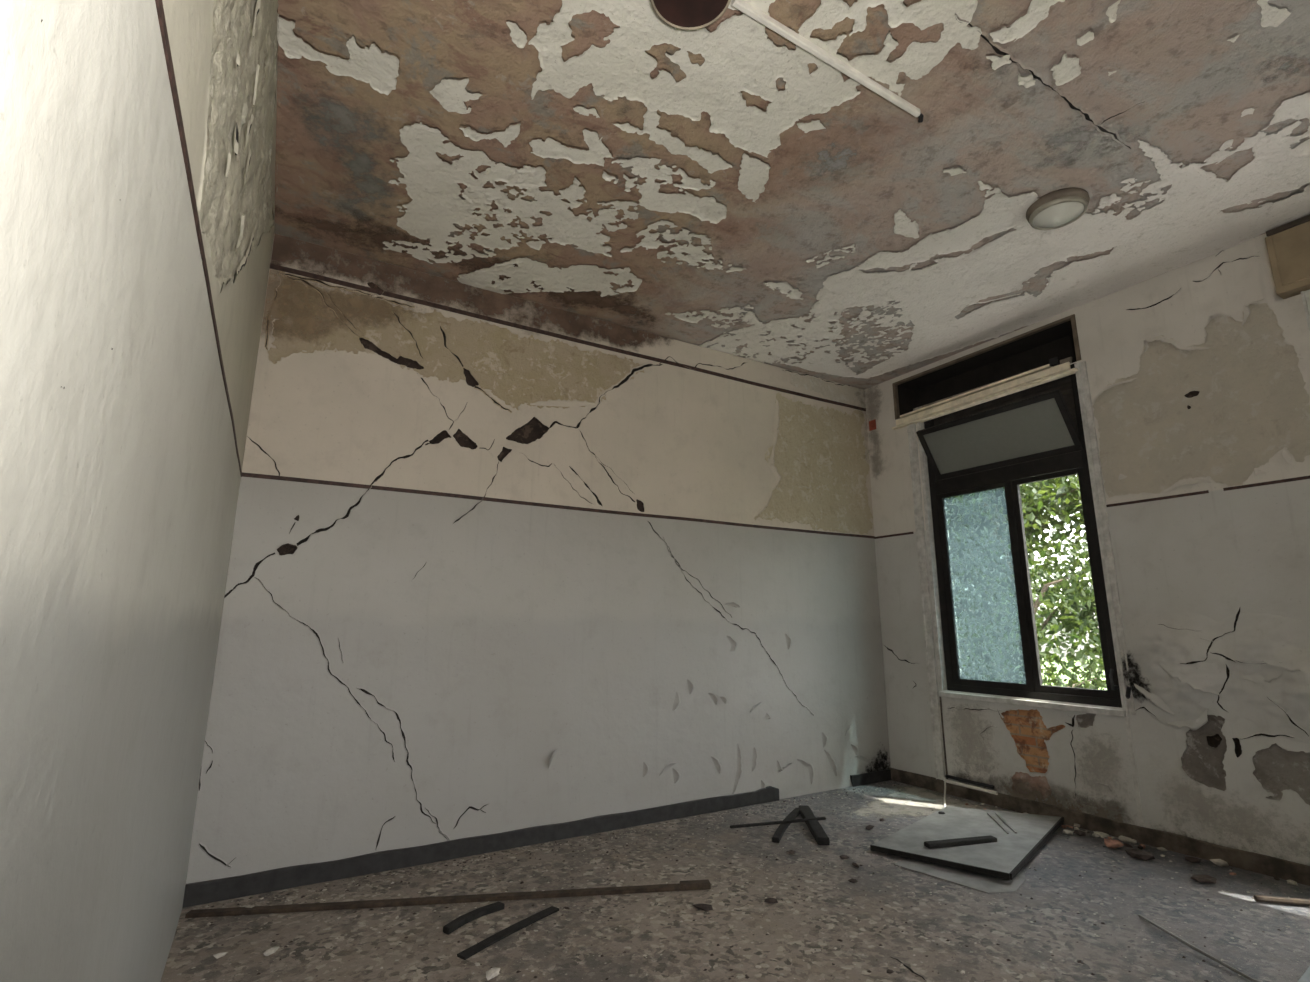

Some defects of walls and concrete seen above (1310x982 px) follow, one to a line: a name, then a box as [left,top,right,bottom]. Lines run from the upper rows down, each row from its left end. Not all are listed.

crack [226,0,261,278]
crack [955,13,1145,150]
water stain [262,96,671,348]
peeling [200,0,1310,535]
crack [224,272,814,851]
flaking render [1000,709,1096,799]
crack [1135,706,1159,720]
crack [1158,607,1310,741]
peeling [1181,715,1310,805]